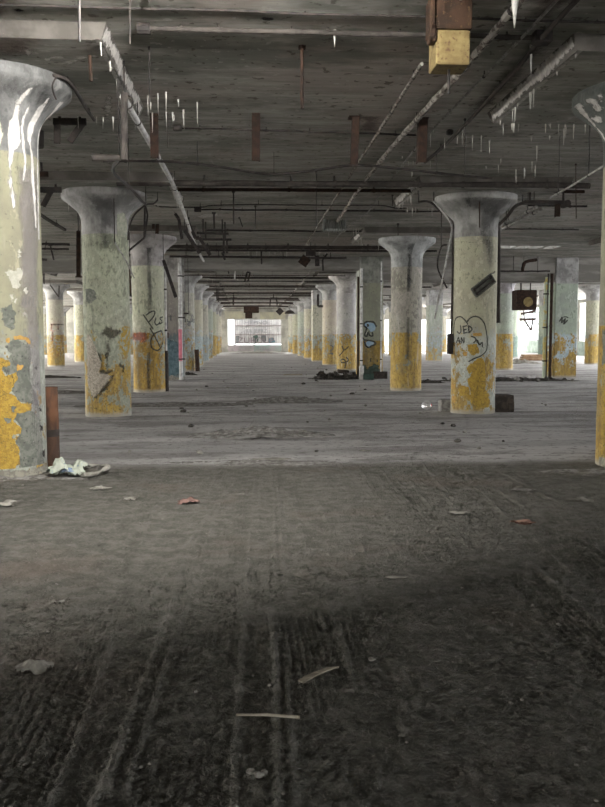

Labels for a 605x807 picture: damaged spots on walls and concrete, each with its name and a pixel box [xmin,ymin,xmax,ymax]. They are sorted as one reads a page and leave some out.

leakage [44,28,142,116]
leakage [490,37,584,132]
leakage [574,94,605,140]
leakage [0,86,63,463]
spalling [86,288,97,304]
peeling [0,268,46,477]
spalling [87,326,131,398]
peeling [452,333,490,408]